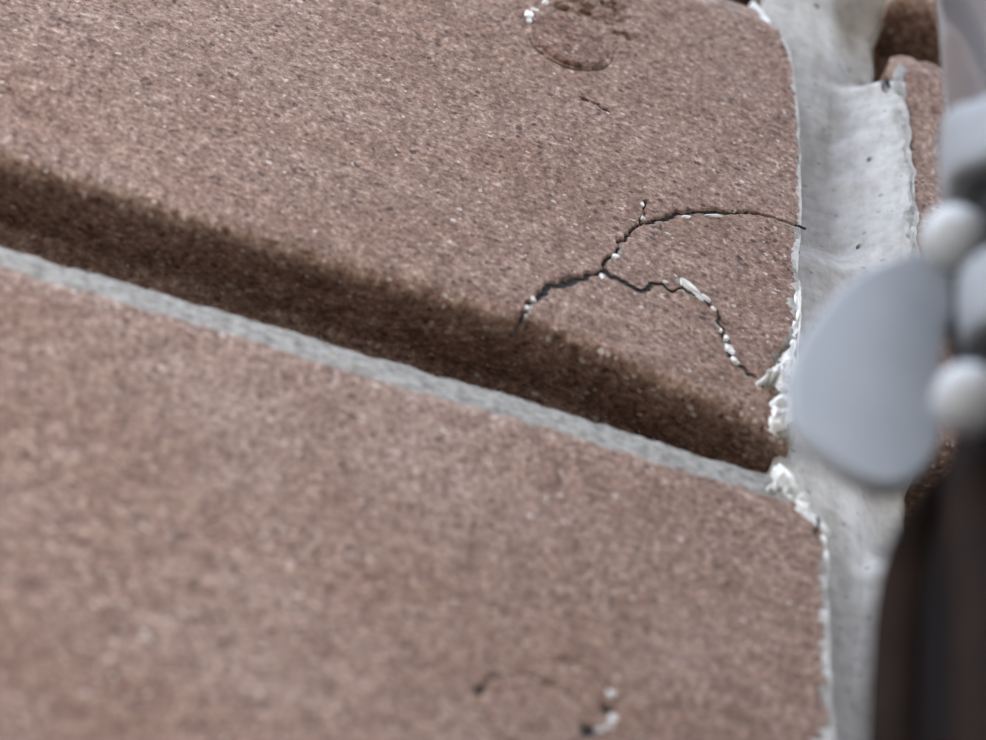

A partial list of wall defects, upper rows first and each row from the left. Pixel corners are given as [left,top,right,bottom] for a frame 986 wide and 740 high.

spalling [524,0,629,70]
crack [508,202,806,377]